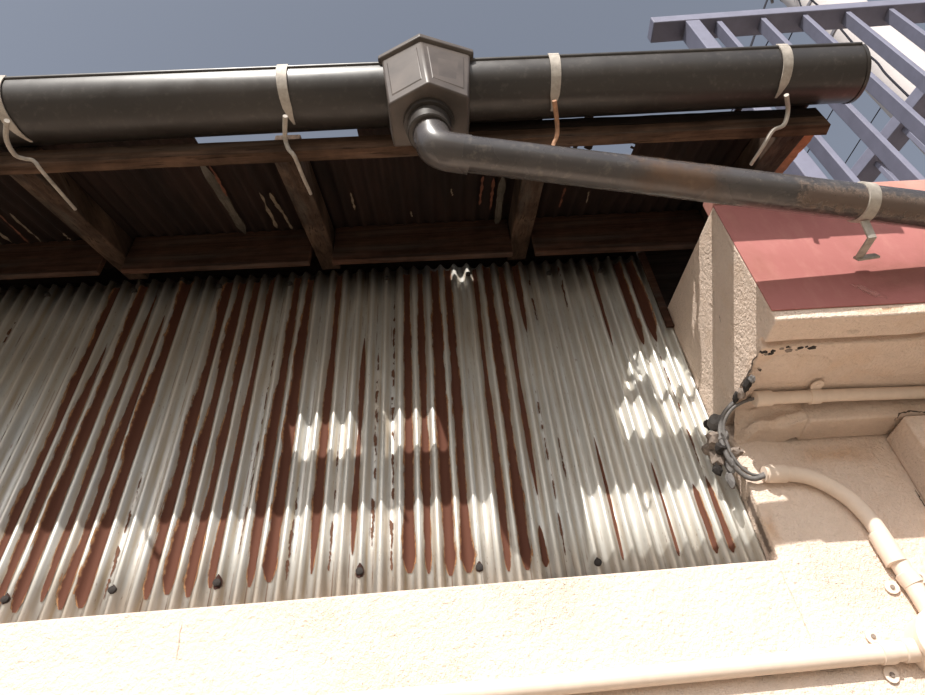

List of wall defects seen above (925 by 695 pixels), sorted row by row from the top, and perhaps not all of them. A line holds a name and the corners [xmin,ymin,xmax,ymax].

rust [0,281,194,613]
rust [142,279,275,600]
rust [238,278,314,587]
rust [310,275,343,574]
rust [351,338,366,578]
rust [389,269,483,576]
rust [472,264,550,571]
rust [594,438,624,560]
rust [613,260,681,411]
rust [651,463,680,556]
rust [686,429,736,554]
spalling [759,346,817,356]